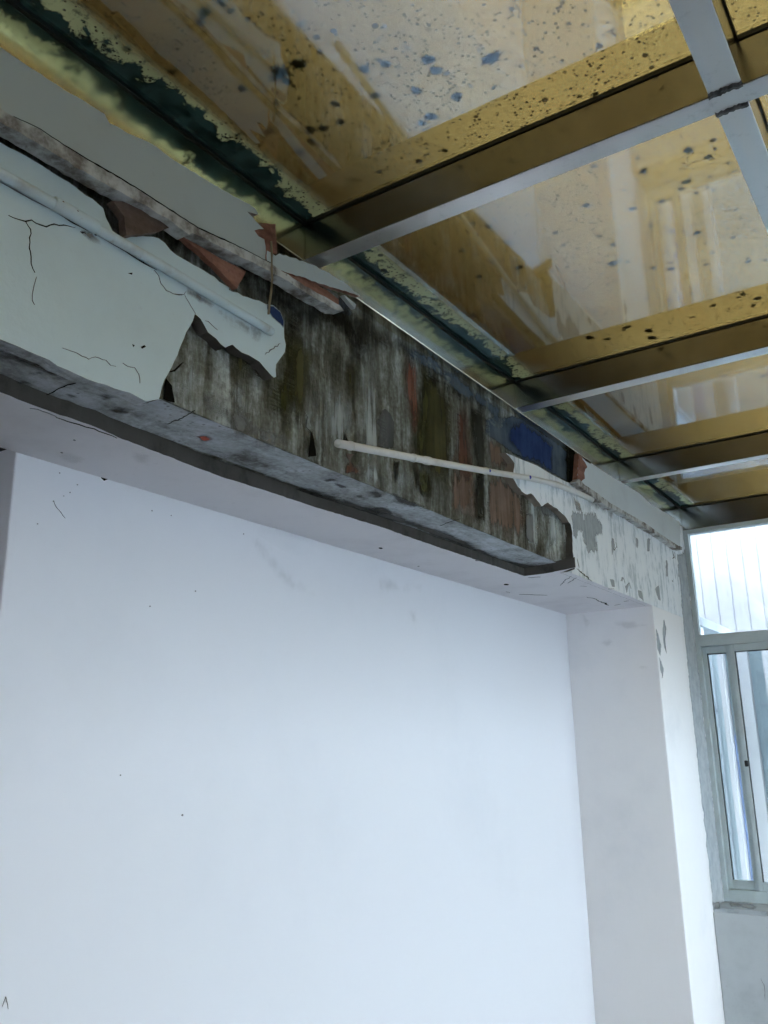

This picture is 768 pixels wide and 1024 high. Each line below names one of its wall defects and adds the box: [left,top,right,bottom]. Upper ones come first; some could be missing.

crack [0,182,216,329]
peeling [267,305,284,327]
damp [243,275,391,363]
crack [63,348,140,380]
spalling [163,379,175,402]
damp [366,382,394,455]
damp [417,367,565,545]
peeling [485,416,567,481]
damp [566,451,574,483]
damp [297,467,533,568]
peeling [571,511,615,554]
peeling [656,621,667,675]